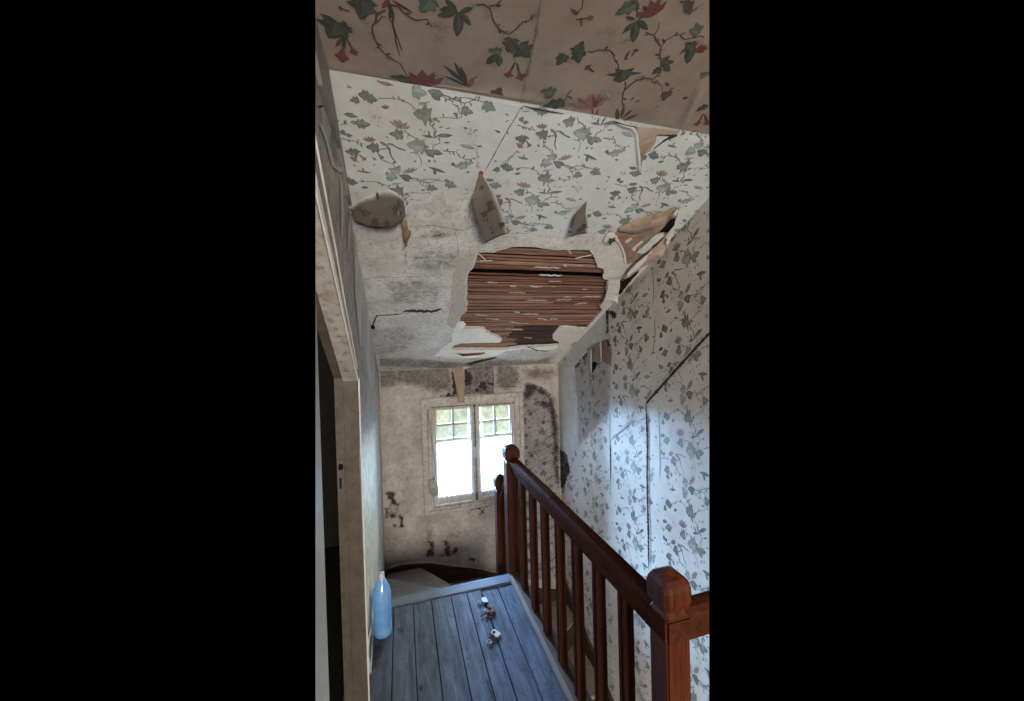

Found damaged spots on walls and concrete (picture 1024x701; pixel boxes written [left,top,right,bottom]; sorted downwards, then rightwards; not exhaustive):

crack [371,308,445,330]
flaking render [318,120,648,469]
leakage [380,359,570,498]
leakage [385,492,404,527]
leakage [526,489,556,580]